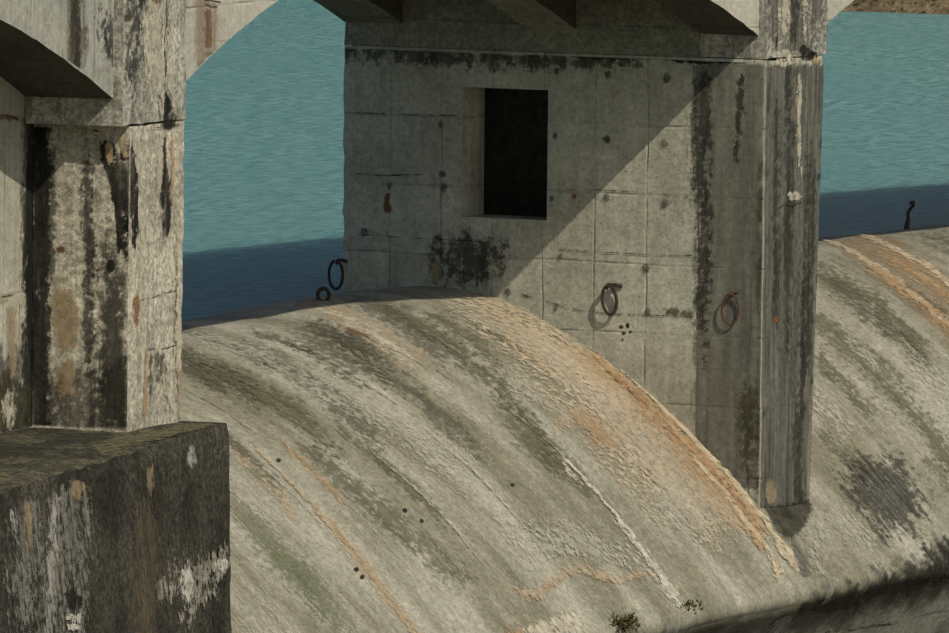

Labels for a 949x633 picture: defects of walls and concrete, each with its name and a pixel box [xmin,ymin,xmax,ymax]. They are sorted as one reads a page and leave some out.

corrosion [197,0,217,65]
damp [768,0,828,52]
damp [9,119,58,426]
damp [79,140,148,425]
damp [157,133,584,633]
damp [543,443,682,607]
corrosion [445,288,800,578]
damp [345,48,949,509]
damp [687,533,949,633]
corrosion [818,234,949,340]